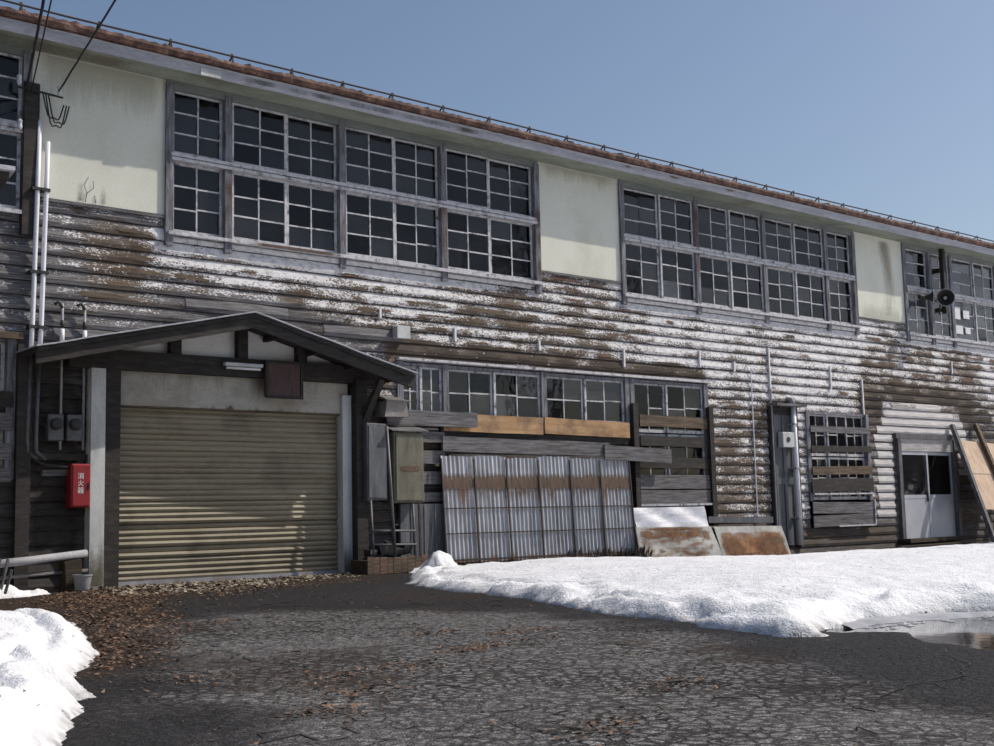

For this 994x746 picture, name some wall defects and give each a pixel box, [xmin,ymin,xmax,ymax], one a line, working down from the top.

peeling [102,227,212,282]
peeling [546,275,585,304]
peeling [405,301,586,334]
peeling [861,336,994,392]
peeling [717,401,770,510]
rust [443,475,630,501]
rust [636,526,791,557]